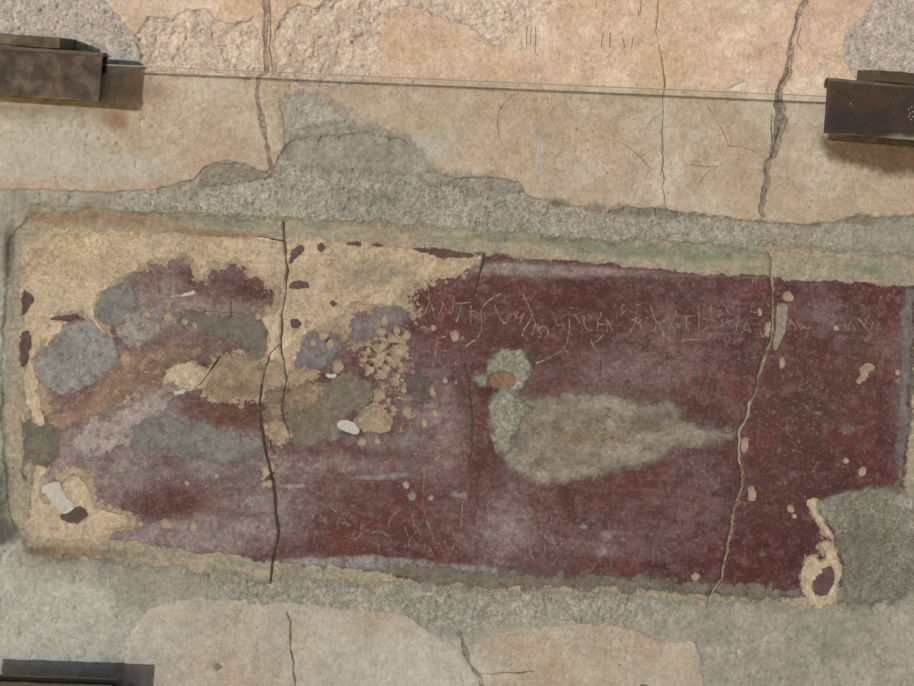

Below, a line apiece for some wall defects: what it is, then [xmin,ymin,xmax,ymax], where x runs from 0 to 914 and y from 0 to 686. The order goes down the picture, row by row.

crack [255,0,288,175]
spalling [135,0,551,153]
crack [619,0,717,209]
crack [707,0,808,218]
peeling [24,464,143,544]
peeling [18,227,481,460]
crack [258,222,292,584]
crack [707,251,774,609]
peeling [789,497,843,610]
crack [286,612,296,686]
crack [457,630,535,686]